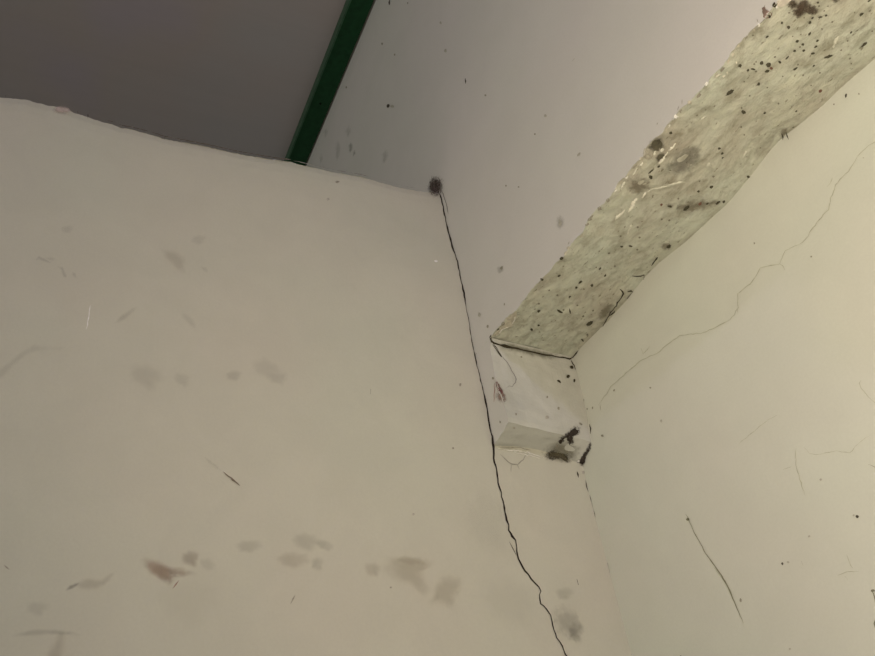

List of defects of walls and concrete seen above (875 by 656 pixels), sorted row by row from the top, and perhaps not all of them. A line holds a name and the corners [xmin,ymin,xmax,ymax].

mould [789,1,816,18]
crack [599,143,873,404]
crack [440,192,578,656]